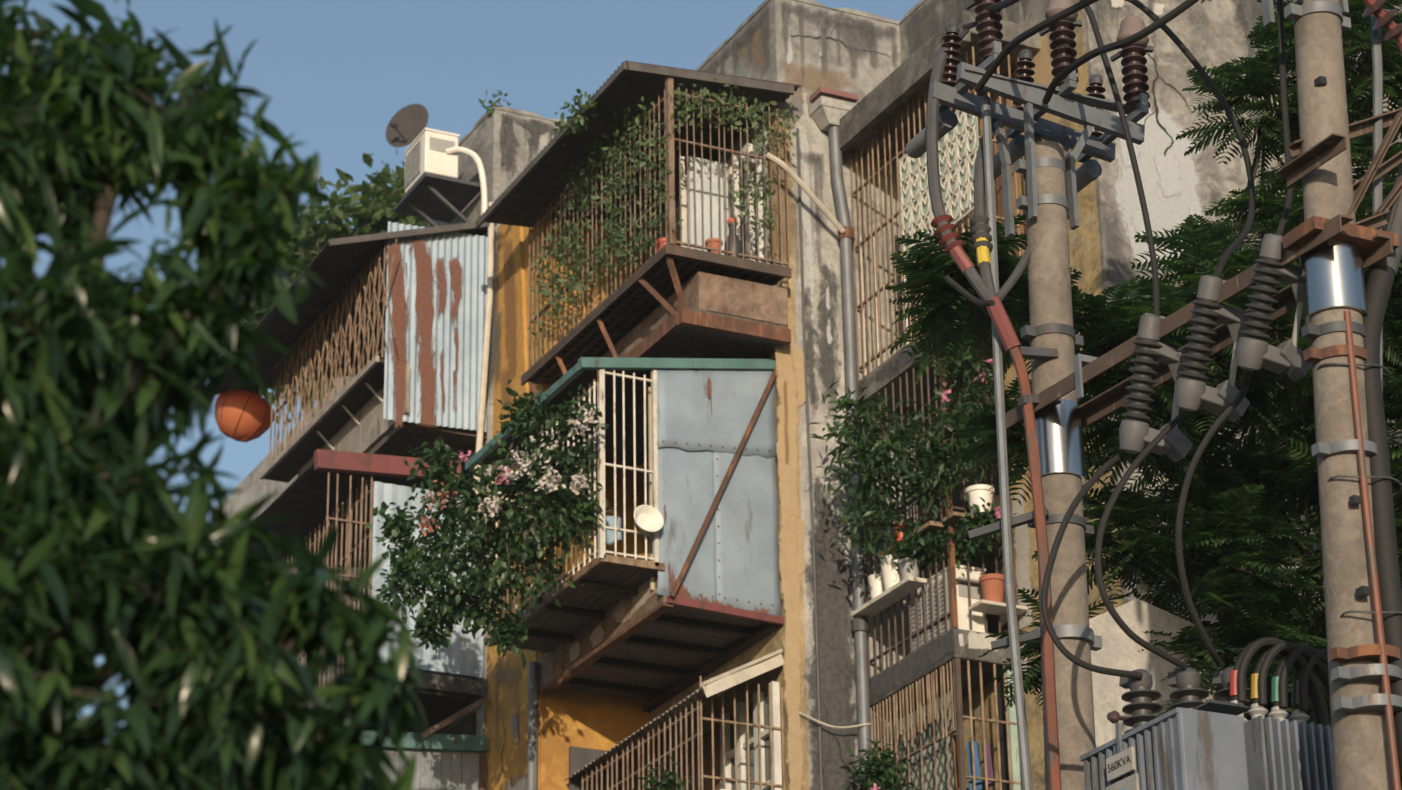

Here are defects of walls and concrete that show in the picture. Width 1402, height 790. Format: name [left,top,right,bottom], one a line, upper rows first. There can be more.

damp [701,0,976,89]
damp [1236,0,1291,58]
damp [772,121,841,416]
rust [388,238,464,428]
damp [859,331,933,393]
rust [668,563,734,607]
damp [805,461,955,790]